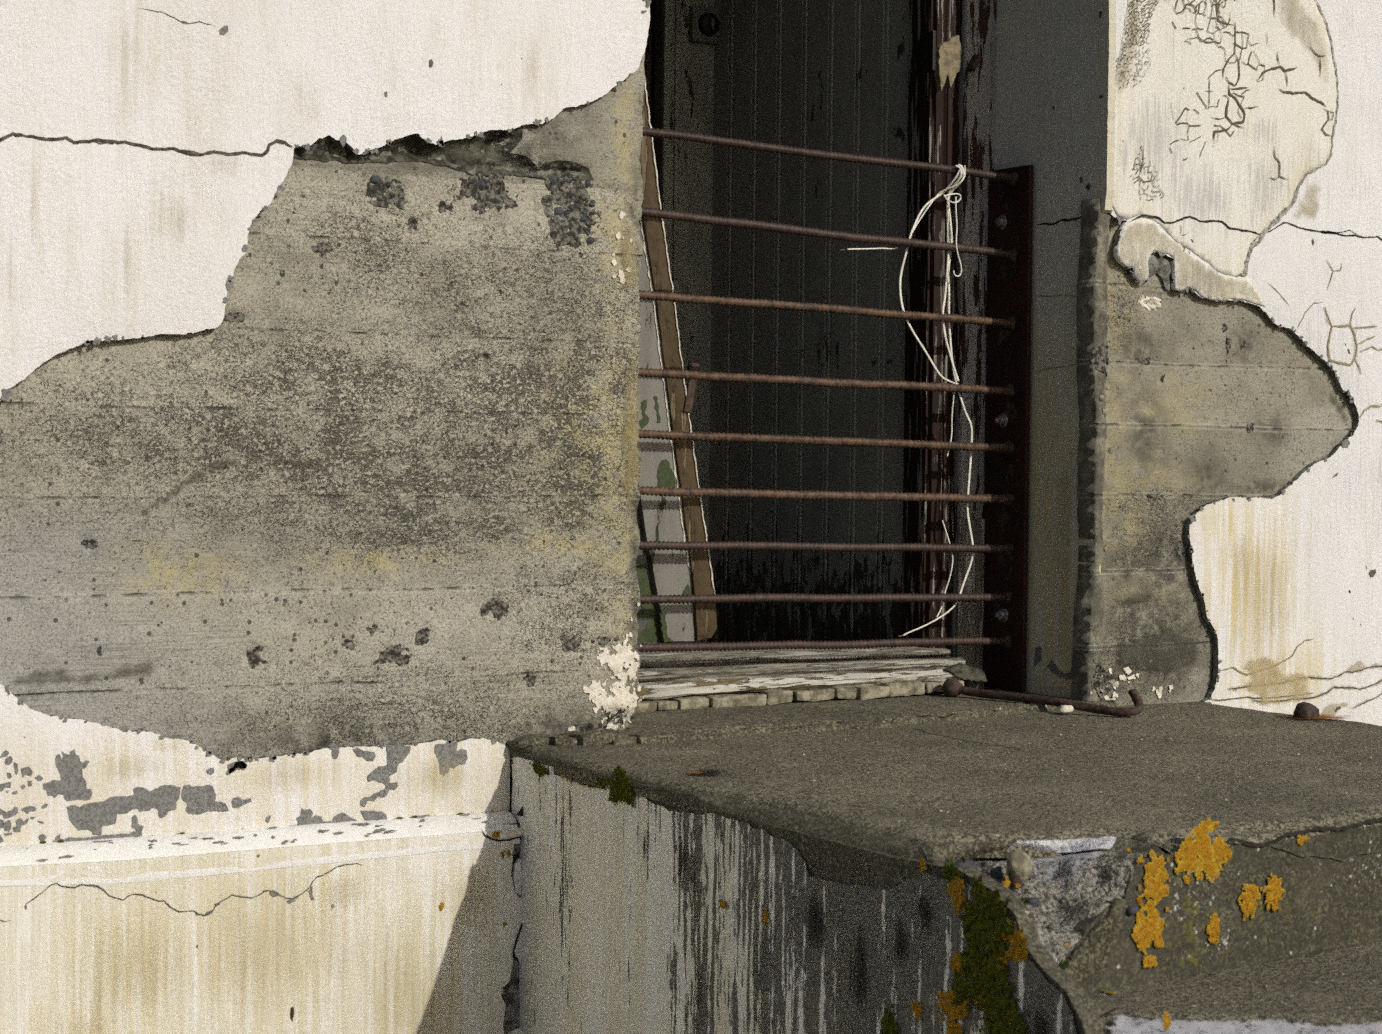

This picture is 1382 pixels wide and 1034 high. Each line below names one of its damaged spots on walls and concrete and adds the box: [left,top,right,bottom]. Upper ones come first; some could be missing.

crack [0,132,294,157]
crack [1038,216,1081,225]
crack [1133,214,1382,374]
spalling [0,53,673,861]
spalling [1034,177,1354,706]
crack [1212,639,1382,716]
crack [1224,817,1382,847]
crack [0,863,363,922]
spalling [920,836,1161,1033]